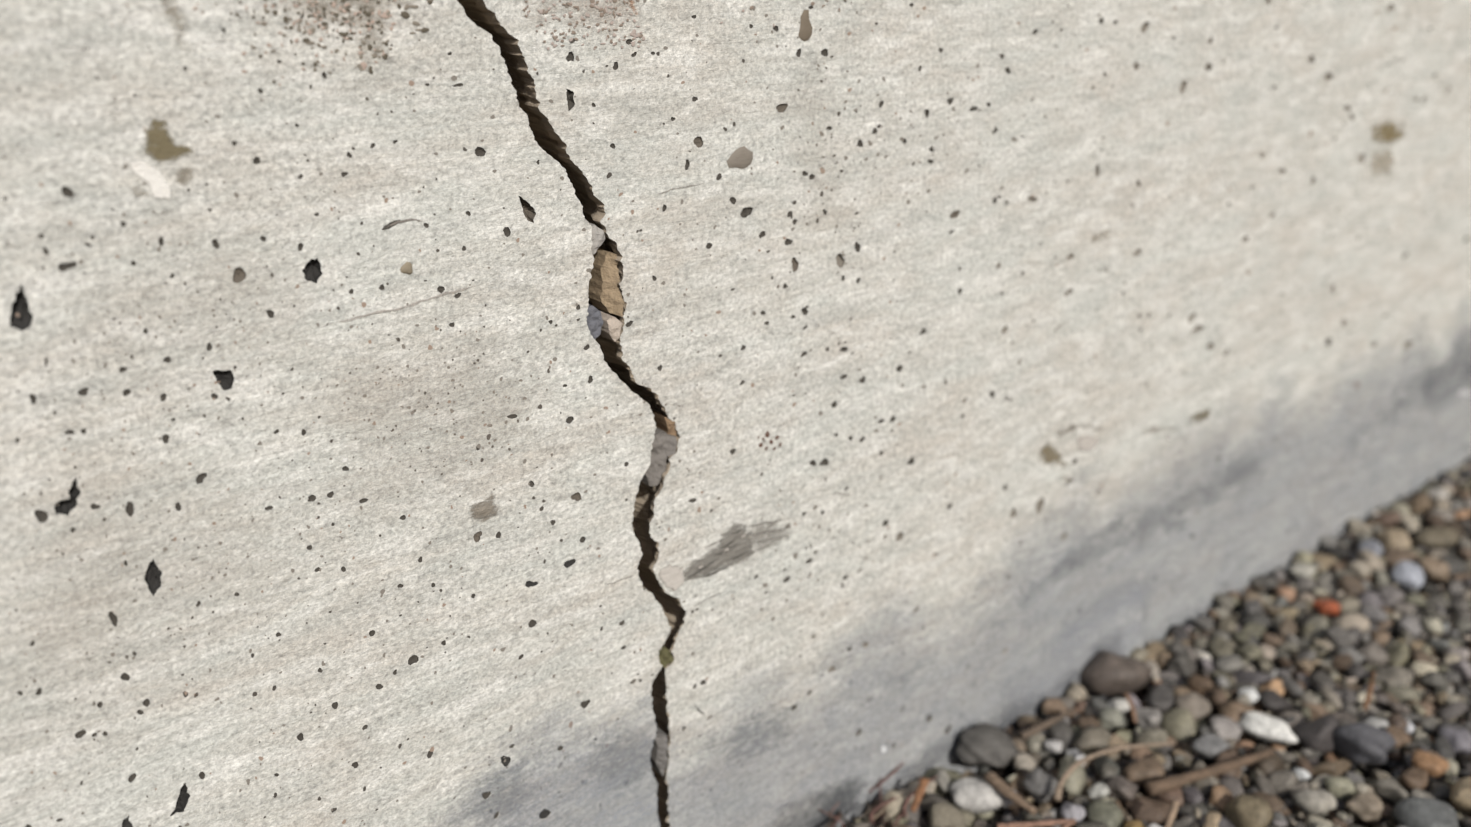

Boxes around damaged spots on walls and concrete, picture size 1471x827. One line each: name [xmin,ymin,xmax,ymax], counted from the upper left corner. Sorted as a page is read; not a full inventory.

crack [457,0,720,827]